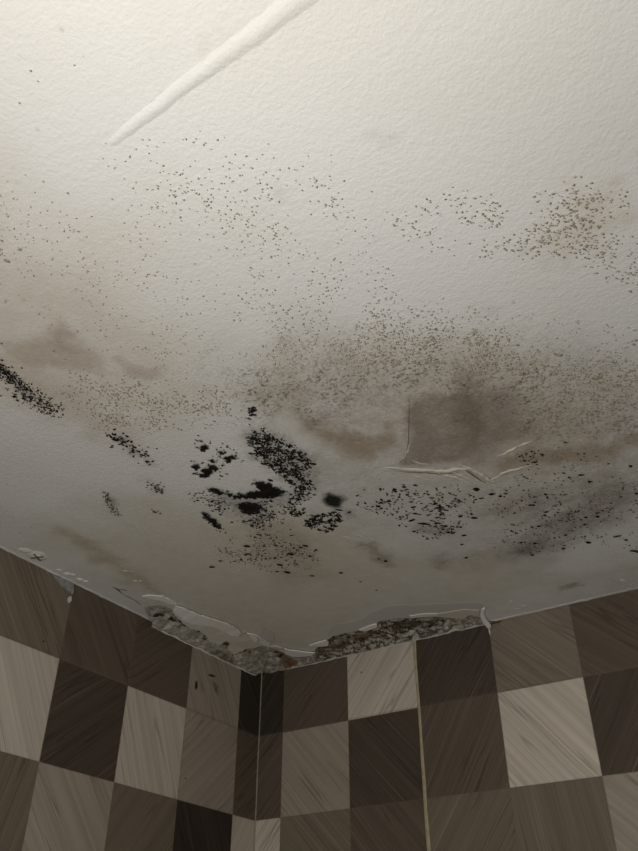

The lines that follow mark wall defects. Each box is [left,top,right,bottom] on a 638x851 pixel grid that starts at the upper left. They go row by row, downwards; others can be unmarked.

water stain [0,139,638,576]
spalling [142,595,501,676]